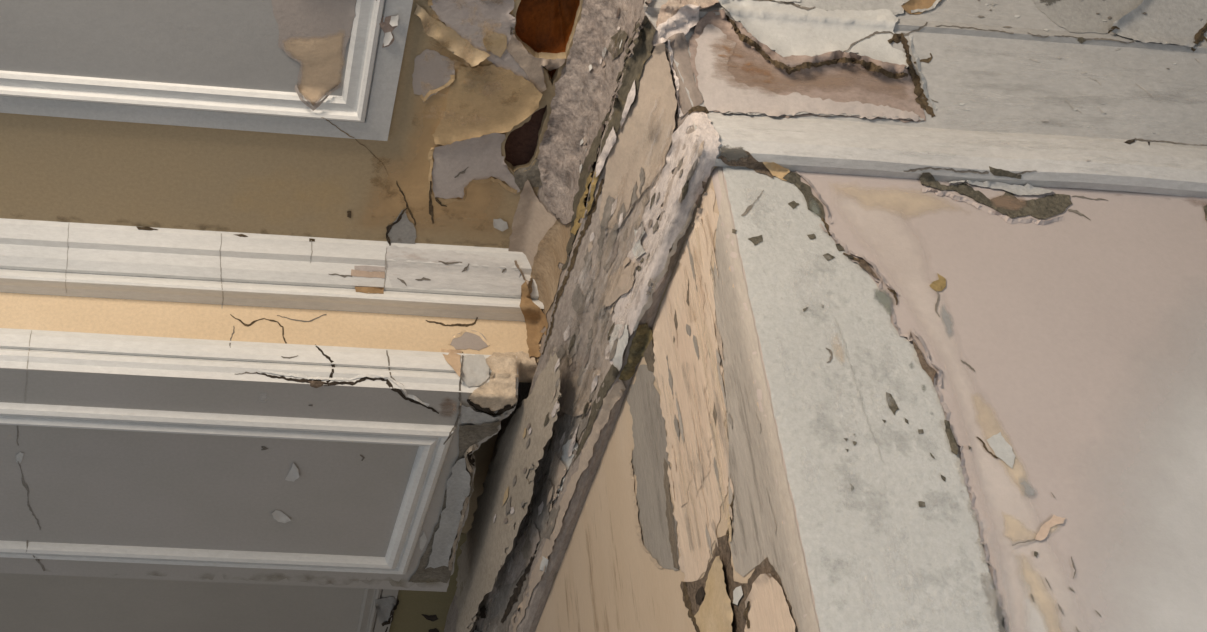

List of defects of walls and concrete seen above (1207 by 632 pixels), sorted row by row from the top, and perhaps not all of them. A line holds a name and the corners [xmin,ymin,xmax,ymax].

peeling [271,0,356,111]
peeling [1096,0,1207,47]
spalling [904,166,1108,225]
crack [219,233,478,445]
spalling [329,0,942,632]
spalling [929,273,952,334]
crack [16,330,45,571]
spalling [944,419,972,455]